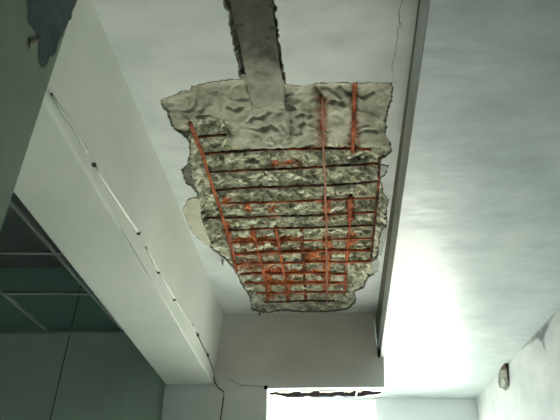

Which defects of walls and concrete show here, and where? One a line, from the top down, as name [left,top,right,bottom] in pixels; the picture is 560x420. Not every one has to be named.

peeling [26,0,77,67]
crack [391,1,403,79]
spalling [160,0,394,316]
corrosion [316,95,327,145]
corrosion [225,222,333,299]
spalling [264,385,381,397]